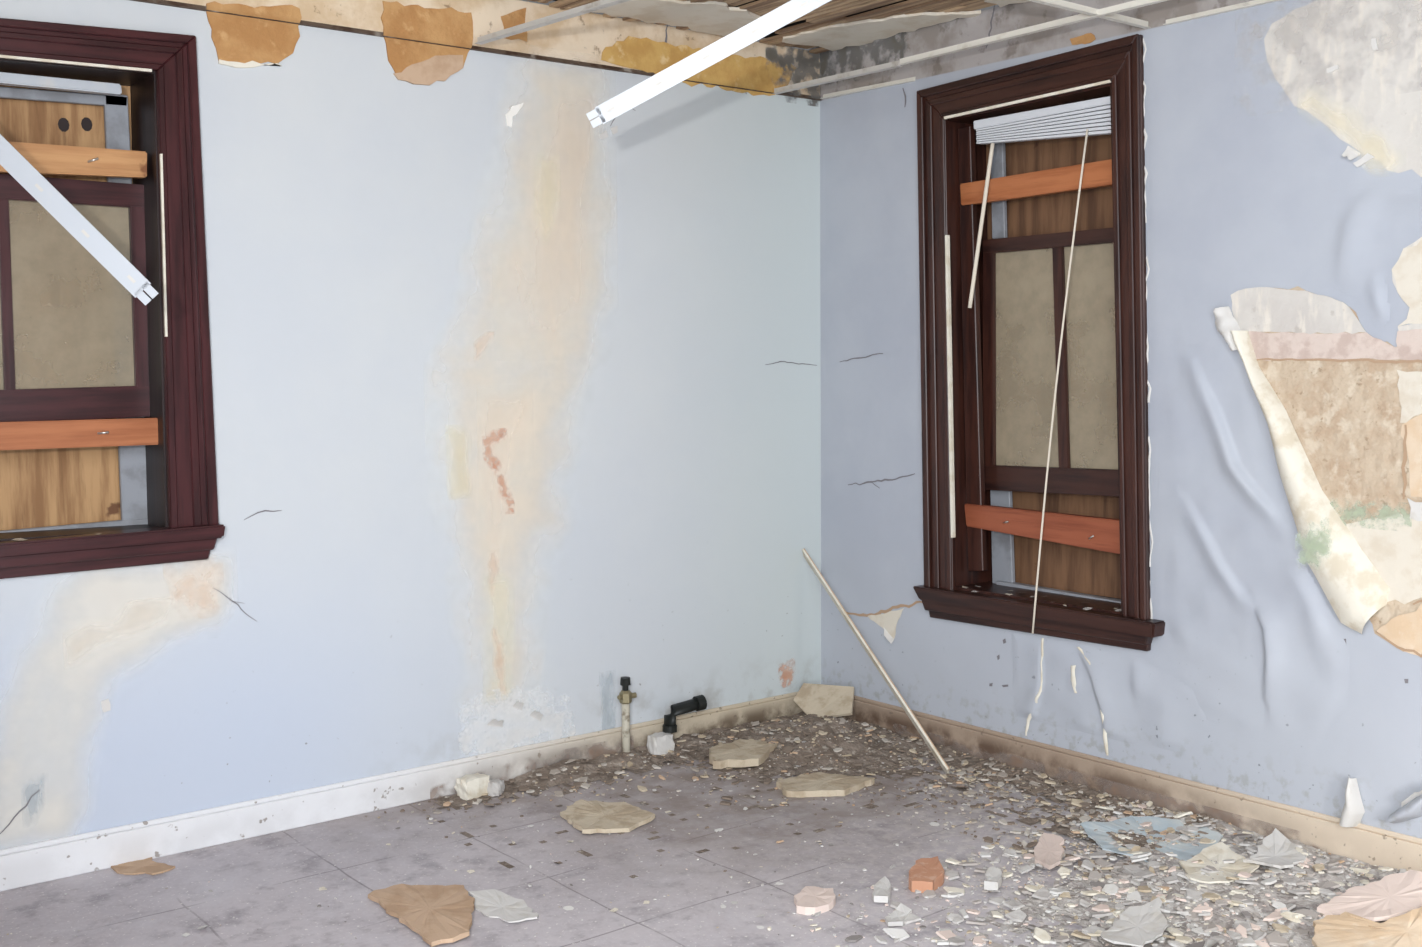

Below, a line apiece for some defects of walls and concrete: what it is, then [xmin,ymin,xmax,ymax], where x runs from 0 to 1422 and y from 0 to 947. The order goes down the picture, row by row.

flaking render [206,1,302,68]
flaking render [381,1,473,85]
flaking render [501,8,527,42]
flaking render [601,36,701,74]
flaking render [682,55,796,96]
peeling [1264,0,1422,177]
water stain [451,67,600,753]
spalling [1231,237,1422,657]
water stain [0,558,229,846]
water stain [588,676,634,760]